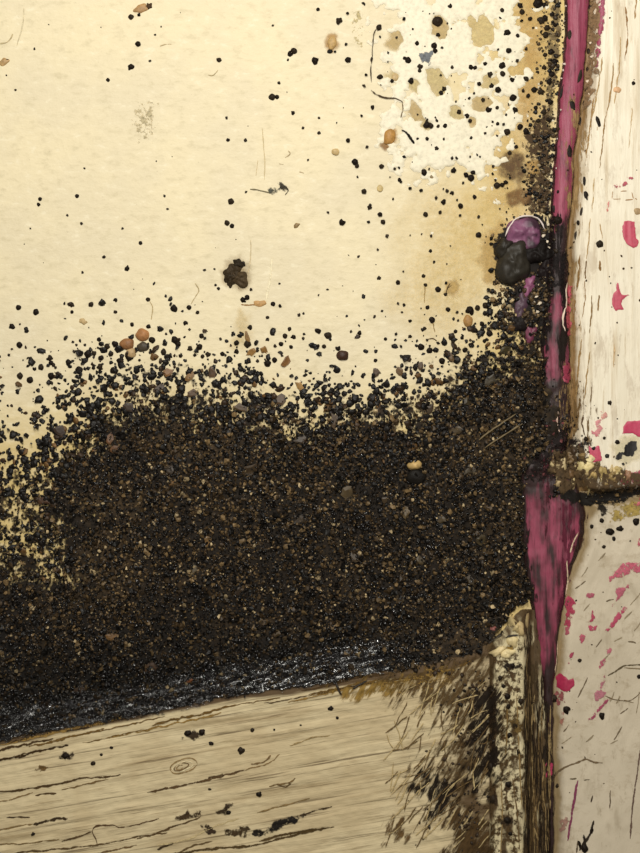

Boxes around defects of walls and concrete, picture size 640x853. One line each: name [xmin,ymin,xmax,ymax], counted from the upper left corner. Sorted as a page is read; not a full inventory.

damp [410,11,452,54]
damp [403,51,423,84]
damp [455,82,499,123]
damp [416,114,447,150]
damp [451,156,475,184]
damp [307,328,332,356]
damp [15,372,33,394]
damp [182,729,205,741]